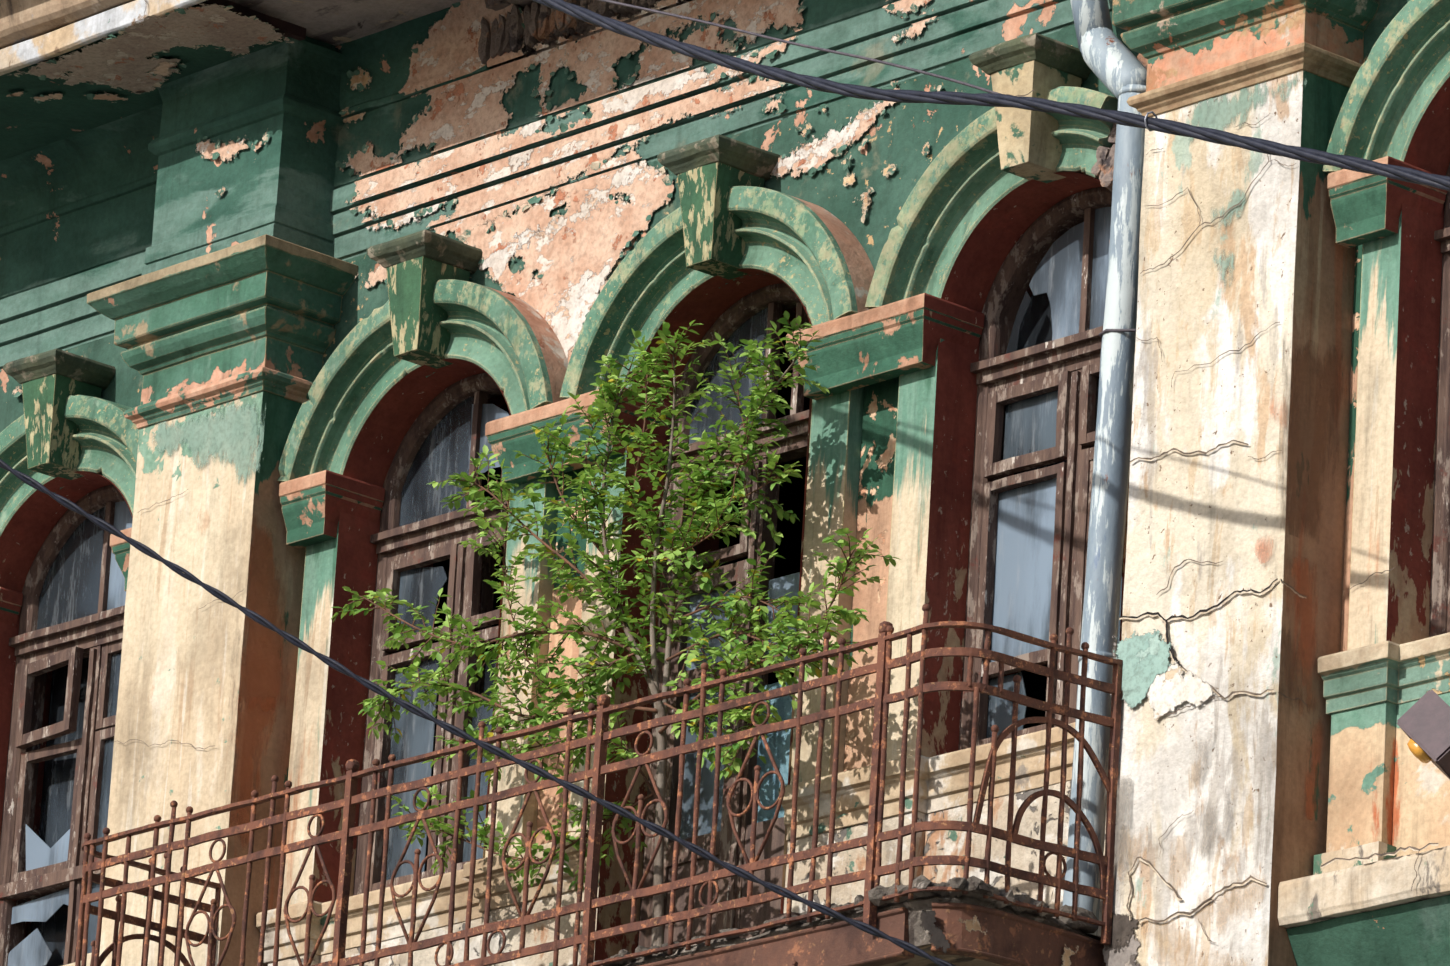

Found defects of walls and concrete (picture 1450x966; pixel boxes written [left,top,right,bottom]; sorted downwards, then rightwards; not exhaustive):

flaking render [5,4,294,104]
flaking render [882,0,936,43]
flaking render [335,0,806,362]
flaking render [770,81,902,223]
crack [1130,440,1282,464]
water stain [1280,346,1340,533]
crack [1119,559,1308,715]
water stain [1283,634,1299,695]
corrosion [958,915,987,935]
corrosion [1061,944,1079,966]
flaking render [1103,911,1142,966]
crack [1126,810,1267,943]